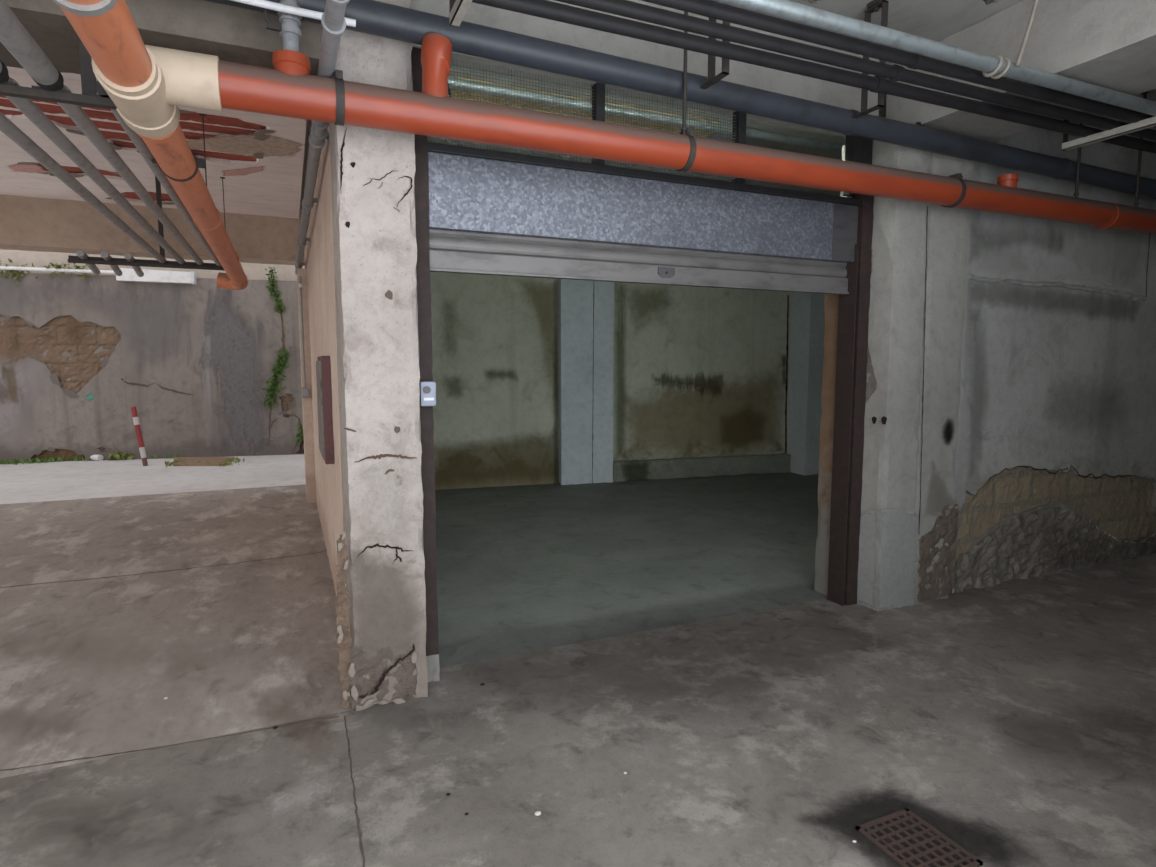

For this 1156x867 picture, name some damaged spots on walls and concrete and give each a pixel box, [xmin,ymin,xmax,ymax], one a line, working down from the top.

spalling [31,99,140,153]
spalling [179,109,302,176]
crack [340,129,413,212]
spalling [0,314,121,405]
crack [344,428,416,474]
damp [439,369,559,482]
damp [624,461,648,481]
damp [657,374,722,394]
crack [358,543,413,562]
peeling [916,467,1156,602]
spalling [335,532,417,709]
crack [0,644,415,867]